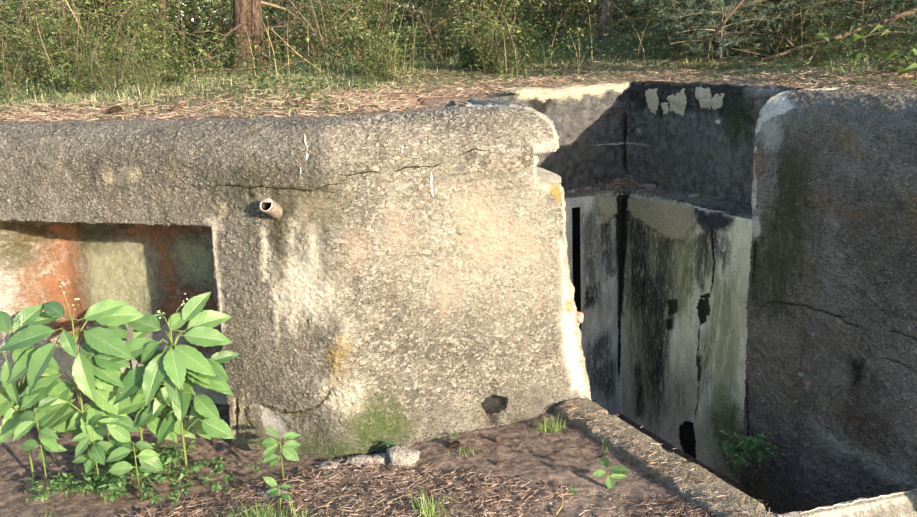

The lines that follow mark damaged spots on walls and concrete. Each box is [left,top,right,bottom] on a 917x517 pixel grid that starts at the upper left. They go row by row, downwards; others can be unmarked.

crack [214,148,485,199]
rust [20,221,95,342]
rust [119,223,219,326]
water stain [262,192,333,334]
peeling [455,81,725,400]
water stain [585,287,599,308]
water stain [588,332,615,399]
water stain [601,222,614,276]
water stain [630,219,663,416]
peeling [679,230,715,458]
water stain [693,227,725,290]